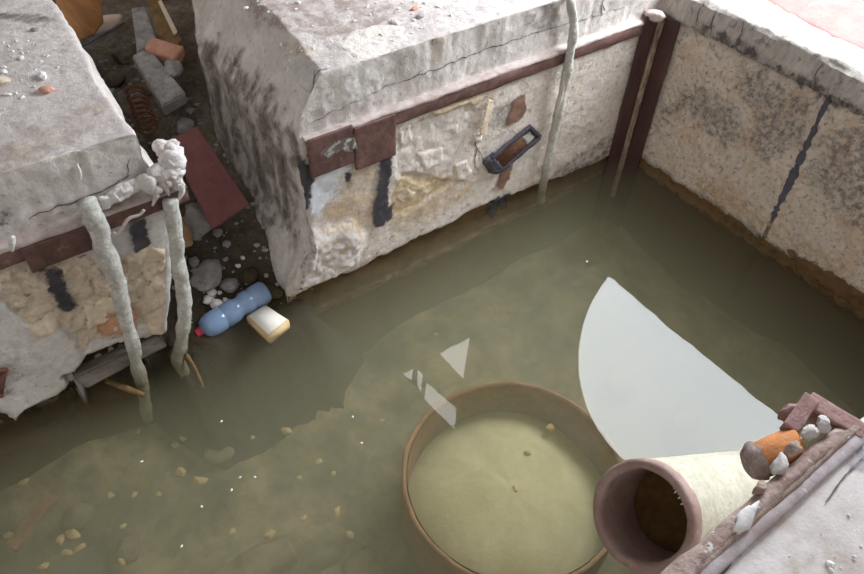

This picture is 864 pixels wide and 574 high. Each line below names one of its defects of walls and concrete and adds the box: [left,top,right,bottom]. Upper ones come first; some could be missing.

spalling [0,253,125,365]
spalling [120,246,166,335]
damp [194,26,299,239]
peeling [309,165,352,217]
rust [493,95,526,126]
damp [638,156,864,320]
crack [763,64,832,239]
spalling [0,373,102,435]